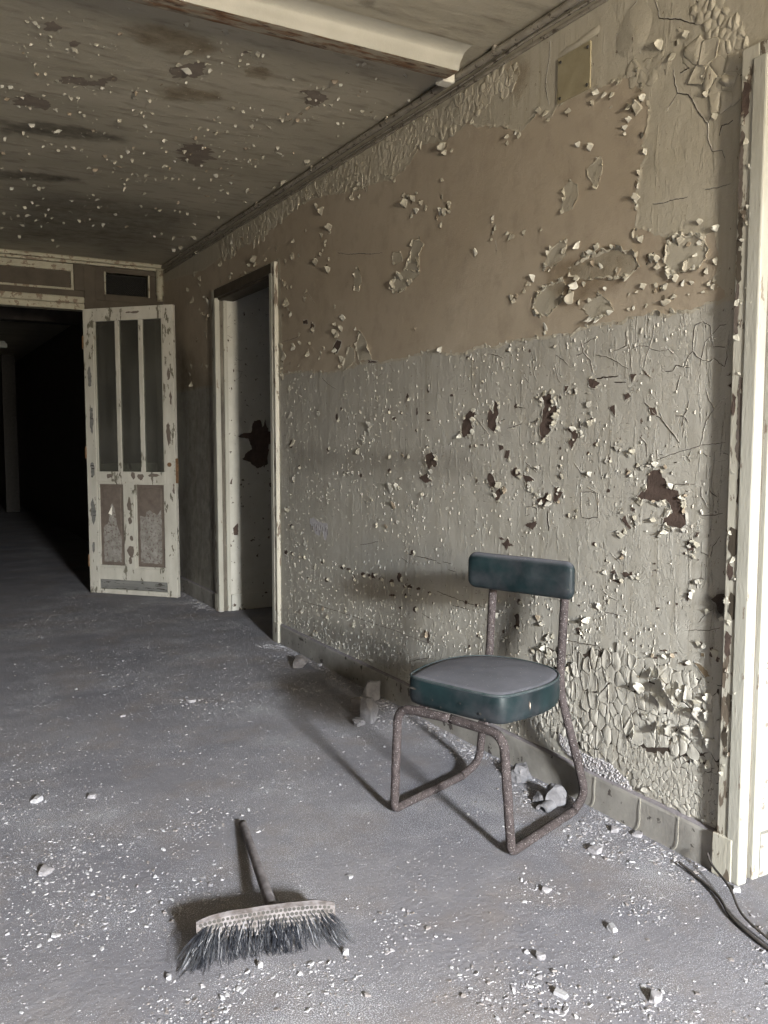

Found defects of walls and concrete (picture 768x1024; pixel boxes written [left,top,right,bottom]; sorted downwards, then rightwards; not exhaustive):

crack [631,0,698,24]
peeling [0,11,520,283]
peeling [590,67,651,136]
crack [666,67,733,158]
peeling [653,27,756,306]
peeling [388,243,423,293]
peeling [484,215,720,353]
peeling [236,418,271,471]
crack [497,321,728,588]
spalling [597,445,711,585]
flaking render [508,615,736,826]